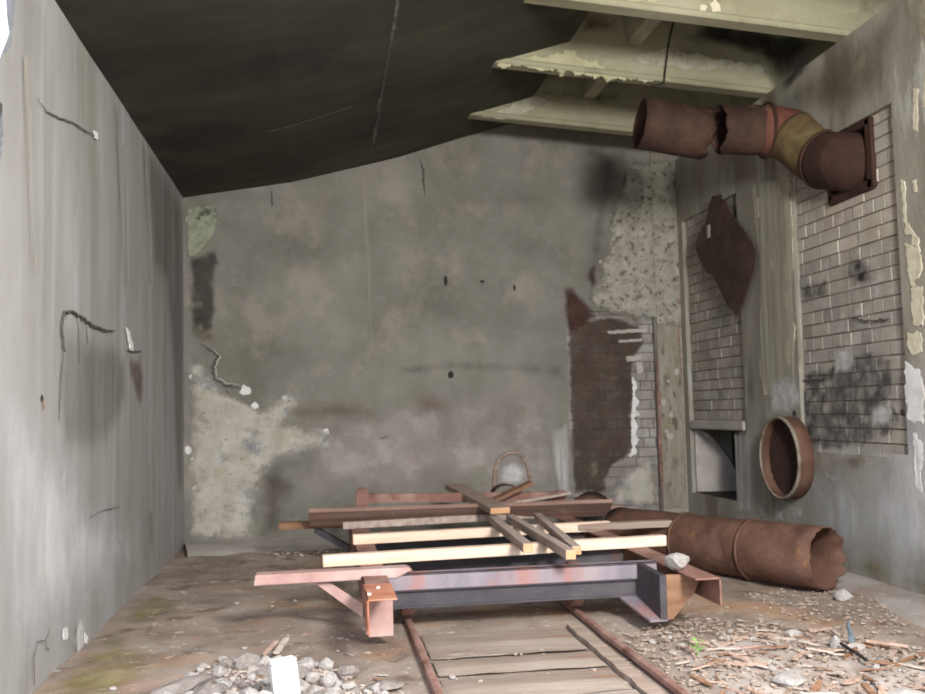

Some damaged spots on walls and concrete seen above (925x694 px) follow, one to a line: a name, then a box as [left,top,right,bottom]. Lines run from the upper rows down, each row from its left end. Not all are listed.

crack [37,99,98,140]
crack [373,0,399,144]
peeling [484,95,546,119]
peeling [497,49,653,83]
crack [59,310,115,421]
damp [192,254,216,338]
crack [197,340,251,398]
spalling [590,161,687,508]
damp [751,177,895,448]
peeling [900,179,925,492]
spalling [185,354,329,539]
damp [824,398,925,563]